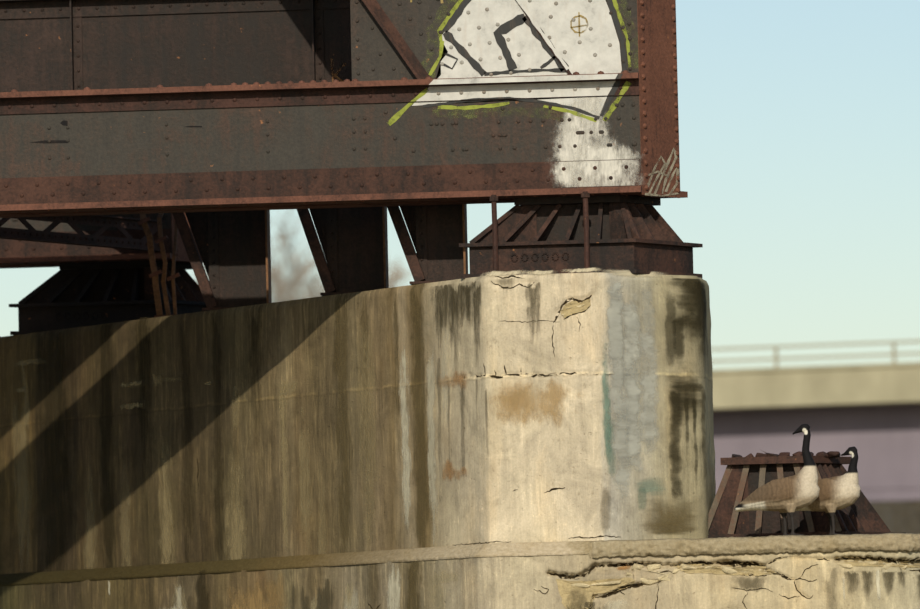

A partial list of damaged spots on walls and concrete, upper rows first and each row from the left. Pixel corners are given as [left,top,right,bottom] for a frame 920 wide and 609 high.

damp [435,281,481,337]
spalling [552,295,592,356]
damp [674,278,707,355]
crack [476,363,640,379]
rust [501,385,564,422]
damp [670,380,706,494]
damp [649,508,691,533]
spalling [534,560,794,609]
spalling [817,556,920,576]